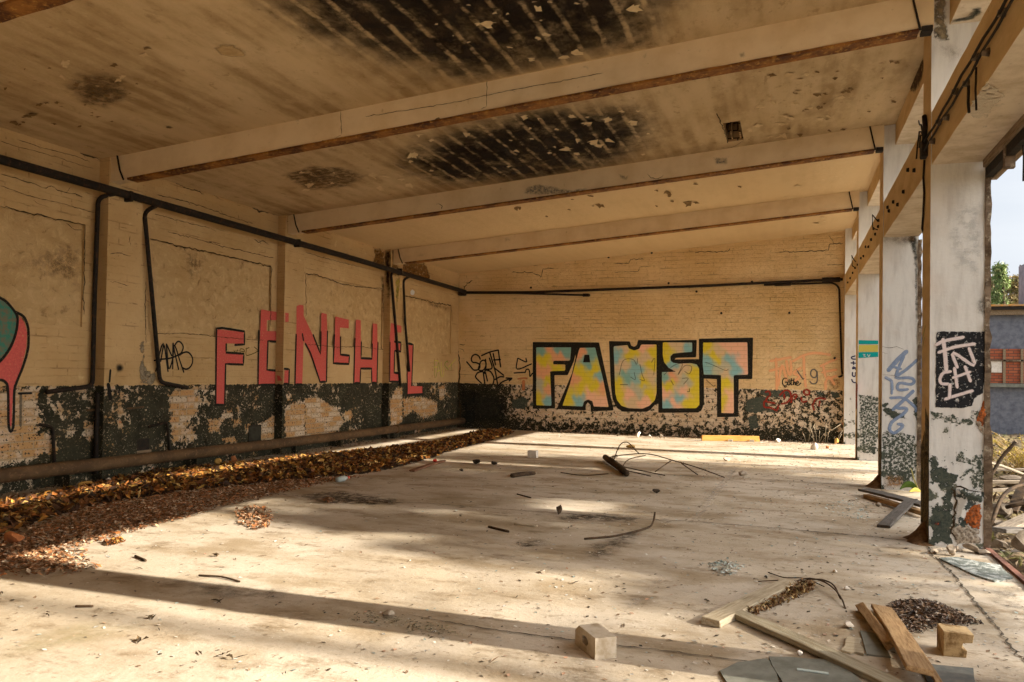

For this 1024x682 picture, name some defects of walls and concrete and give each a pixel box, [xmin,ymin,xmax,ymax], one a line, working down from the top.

leakage [289,167,356,189]
peeling [0,386,94,467]
peeling [168,385,354,446]
peeling [512,397,533,410]
peeling [859,395,986,545]